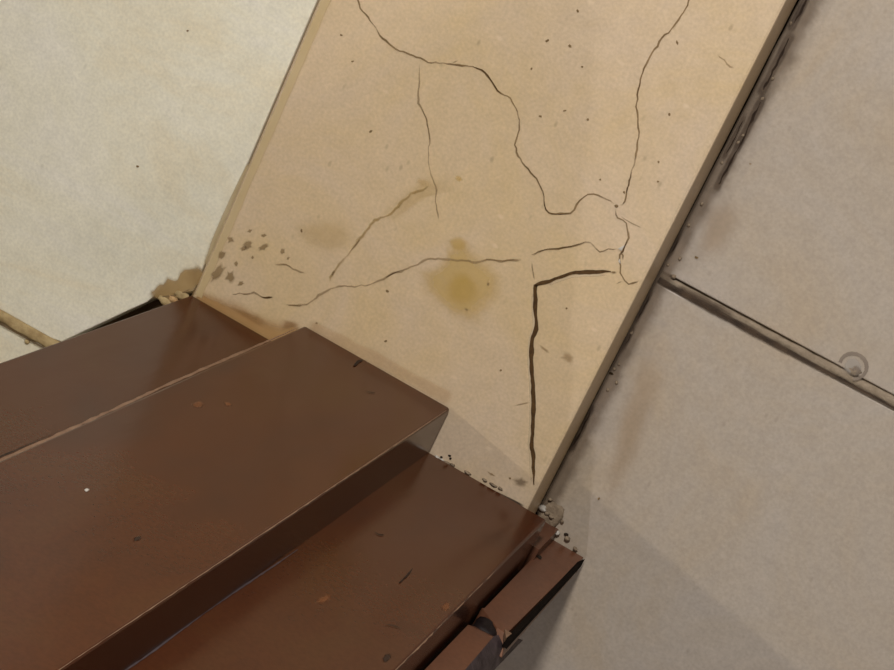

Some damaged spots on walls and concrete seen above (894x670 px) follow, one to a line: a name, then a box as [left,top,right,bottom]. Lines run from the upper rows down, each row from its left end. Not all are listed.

crack [235,0,689,485]